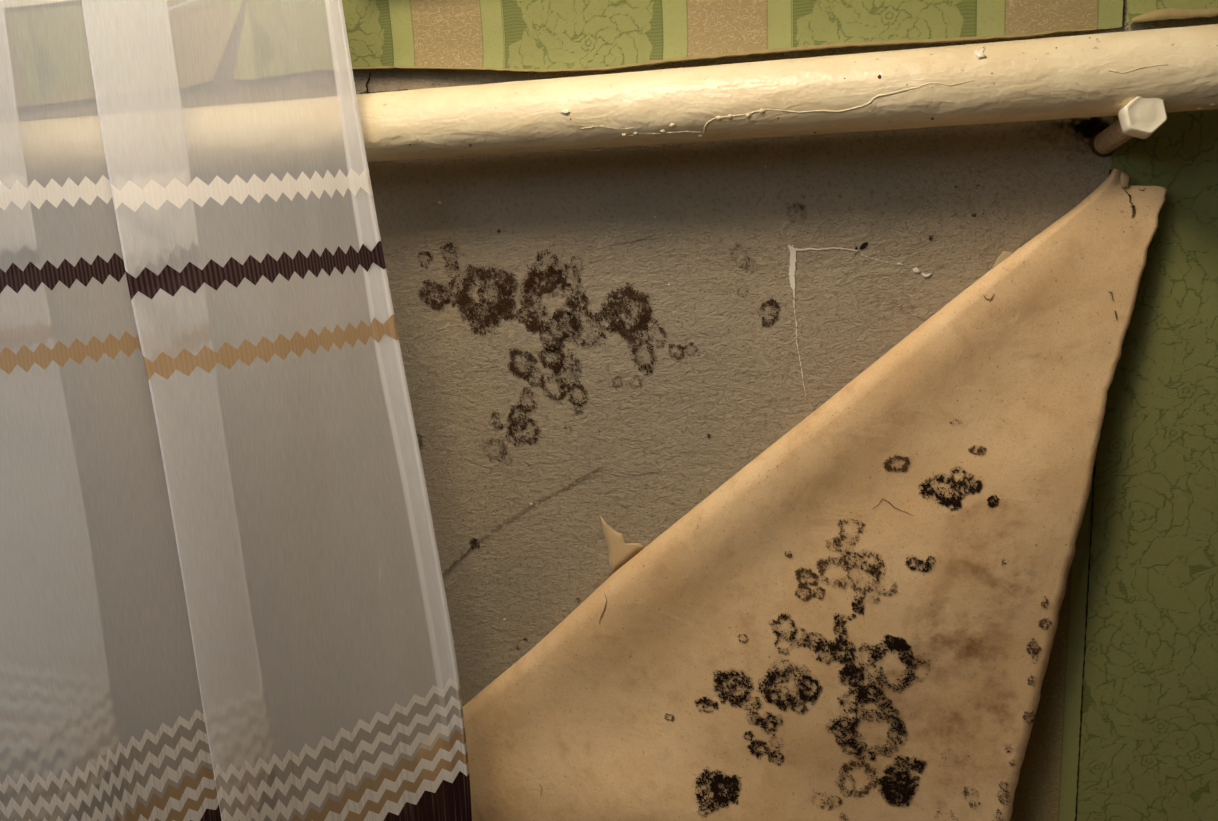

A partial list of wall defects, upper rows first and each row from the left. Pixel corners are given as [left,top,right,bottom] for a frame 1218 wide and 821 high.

mould [418,242,698,466]
mould [883,455,911,472]
mould [919,466,1002,511]
mould [905,555,936,572]
mould [1026,596,1052,685]
mould [695,518,931,821]
mould [996,781,1011,821]